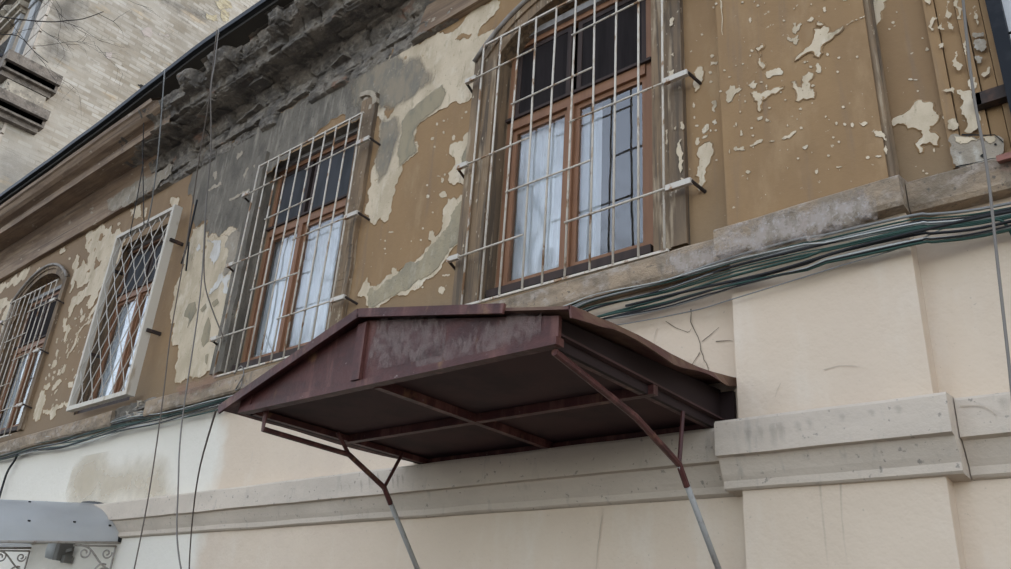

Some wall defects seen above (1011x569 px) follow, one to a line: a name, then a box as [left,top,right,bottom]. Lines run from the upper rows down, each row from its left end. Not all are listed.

peeling [665,0,898,194]
flaking render [825,13,1004,168]
flaking render [922,0,962,51]
flaking render [33,0,501,422]
flaking render [0,267,40,332]
crack [654,309,731,370]